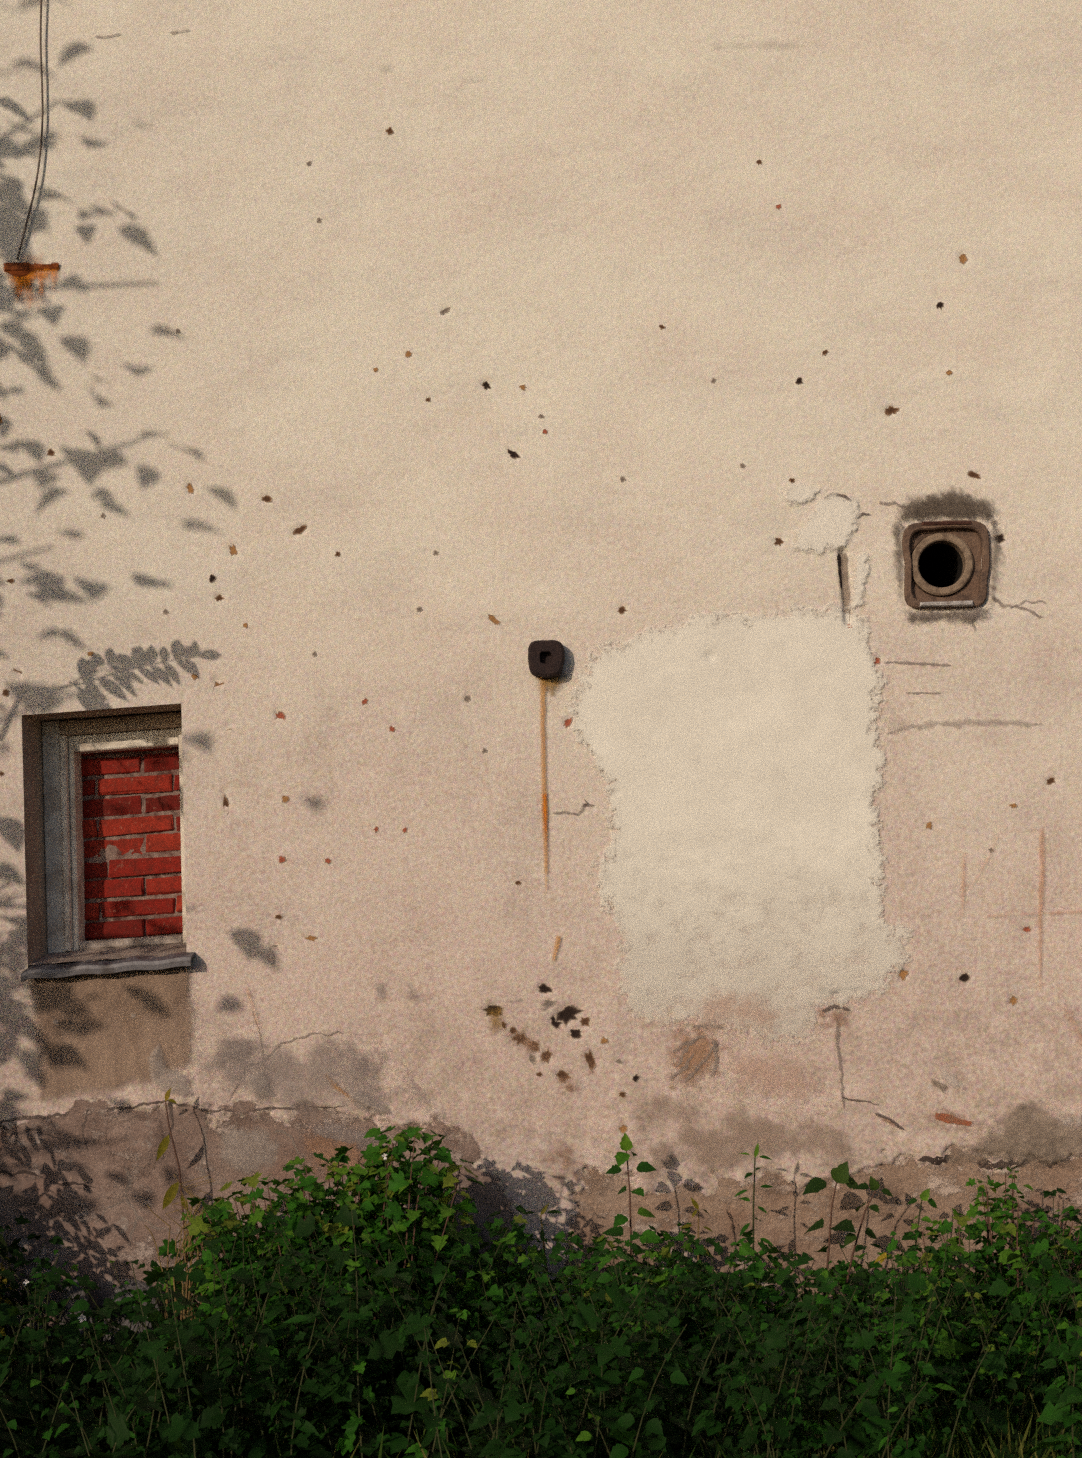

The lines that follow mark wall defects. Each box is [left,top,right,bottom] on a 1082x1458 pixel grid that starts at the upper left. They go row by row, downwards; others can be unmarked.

rust [4,262,59,296]
rust [540,676,560,874]
leakage [35,966,190,1097]
spalling [482,1004,572,1091]
spalling [538,983,609,1073]
spalling [615,1058,640,1098]
spalling [875,1113,904,1130]
spalling [935,1113,971,1126]
leakage [949,1103,1082,1163]
flaking render [0,1098,531,1351]
flaking render [565,1145,1082,1319]